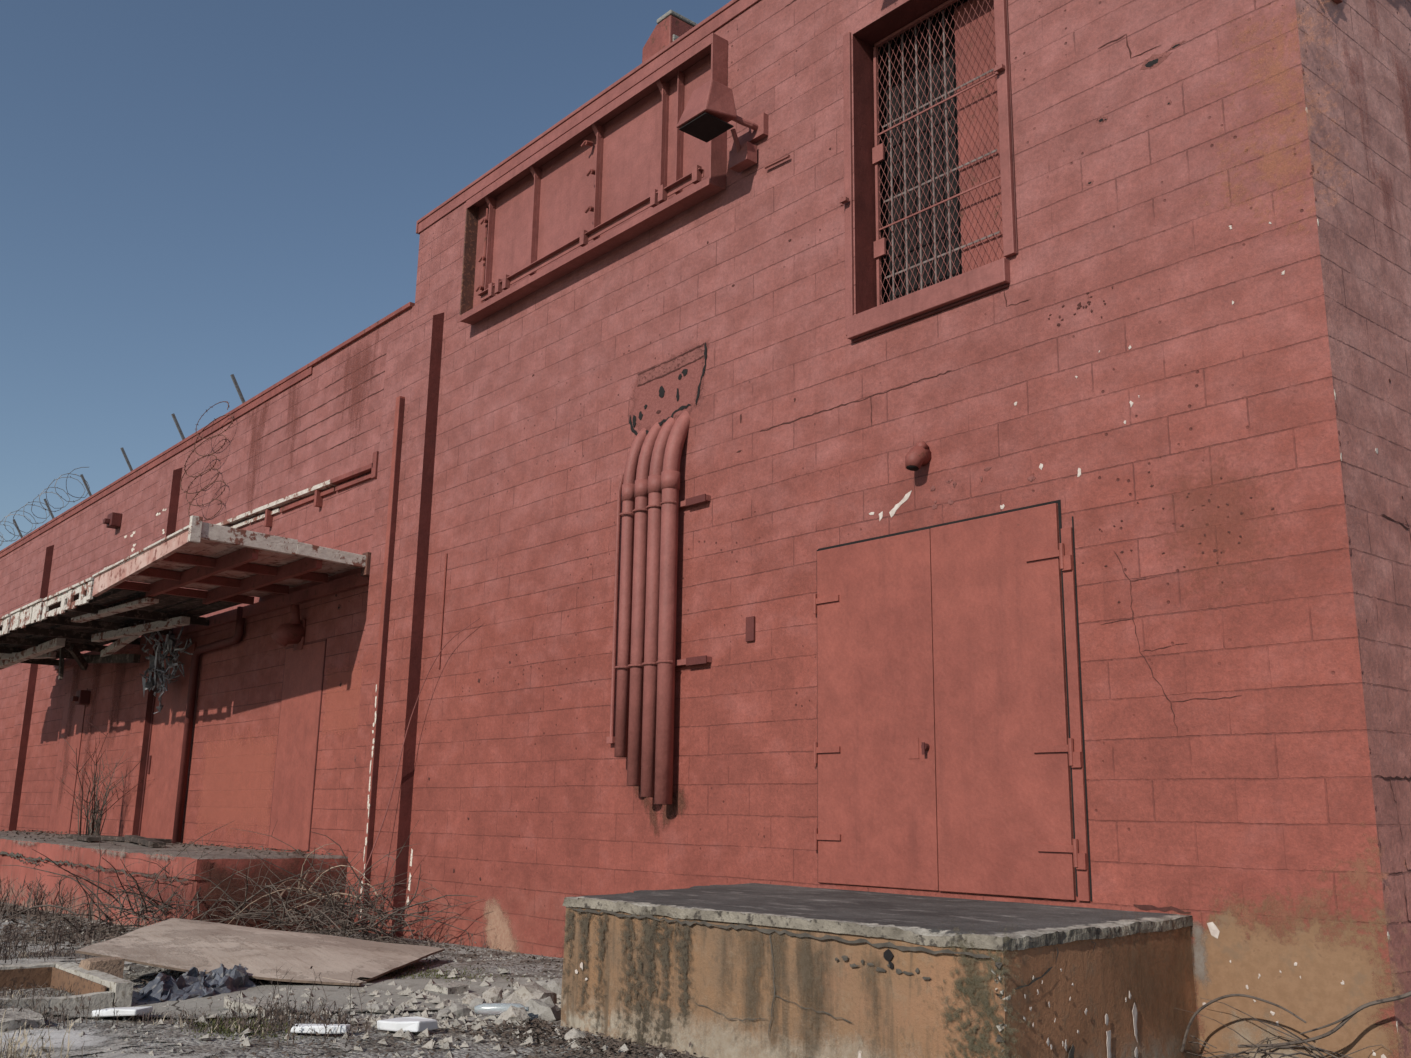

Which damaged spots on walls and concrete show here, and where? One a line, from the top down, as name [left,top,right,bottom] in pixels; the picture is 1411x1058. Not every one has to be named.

spalling [629,342,708,436]
crack [1382,514,1411,537]
crack [1101,552,1242,727]
crack [1376,775,1411,922]
water stain [560,909,871,1058]
water stain [1236,1027,1295,1058]